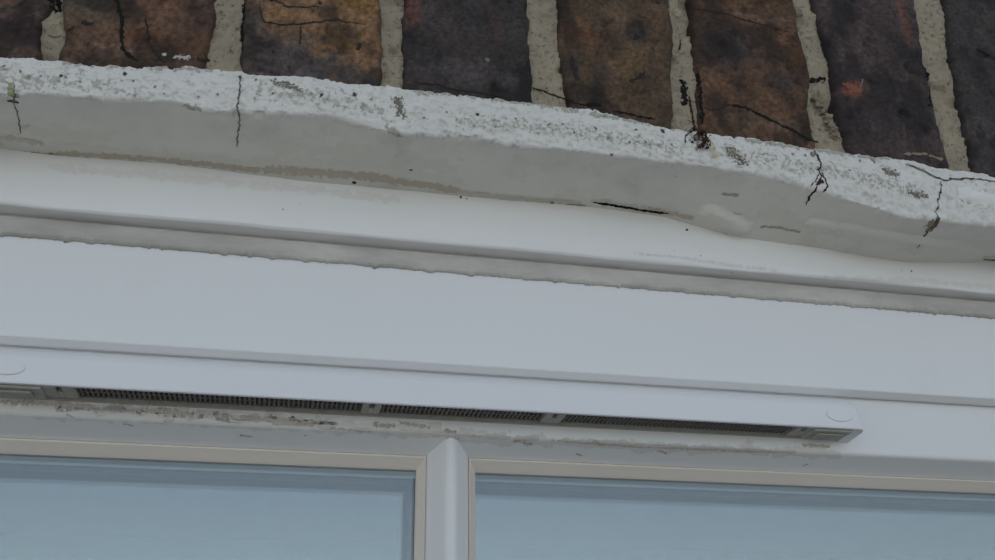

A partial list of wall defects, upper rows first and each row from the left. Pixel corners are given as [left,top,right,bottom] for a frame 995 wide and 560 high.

crack [113,0,163,62]
crack [240,0,366,52]
crack [12,85,21,133]
crack [234,77,242,147]
crack [695,71,828,205]
crack [593,202,669,214]
crack [907,164,995,248]